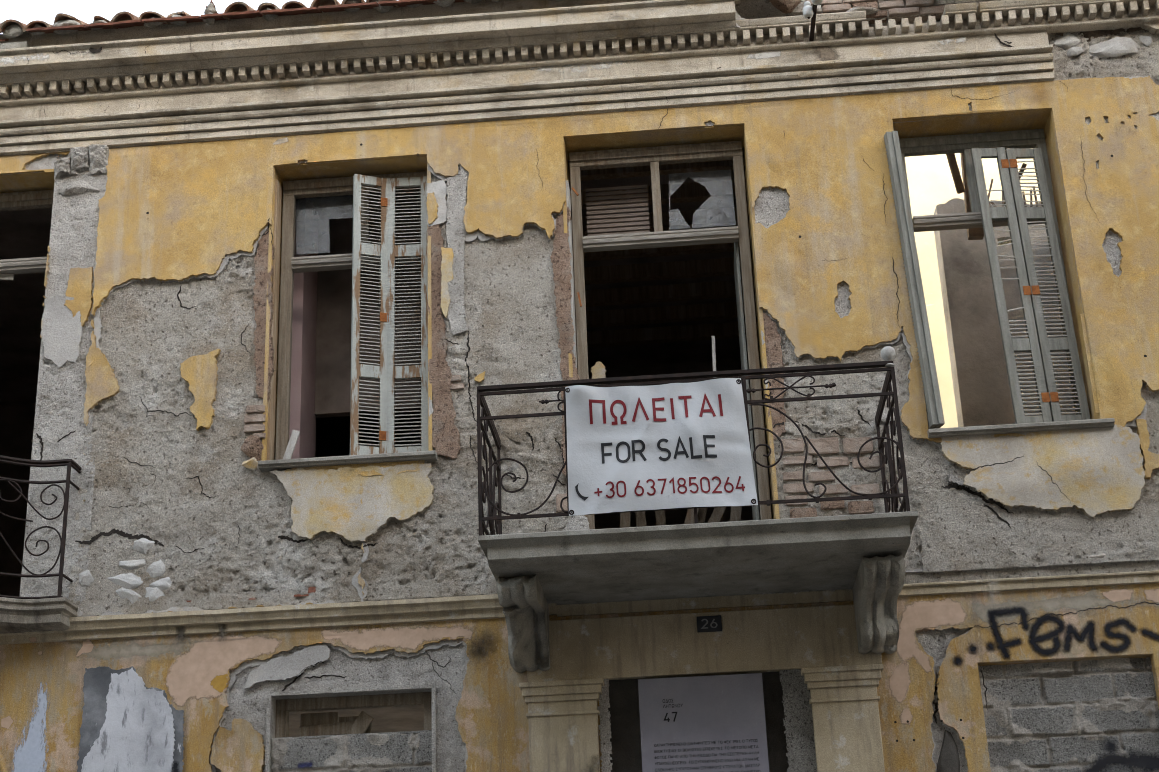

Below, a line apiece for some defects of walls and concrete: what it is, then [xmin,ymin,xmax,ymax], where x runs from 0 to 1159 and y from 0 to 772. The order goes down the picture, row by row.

flaking render [791,0,979,24]
spalling [1048,29,1159,85]
spalling [1085,112,1159,140]
spalling [754,188,789,228]
spalling [1102,230,1122,277]
spalling [834,282,851,318]
spalling [20,154,589,617]
spalling [763,312,1159,772]
spalling [166,625,473,772]